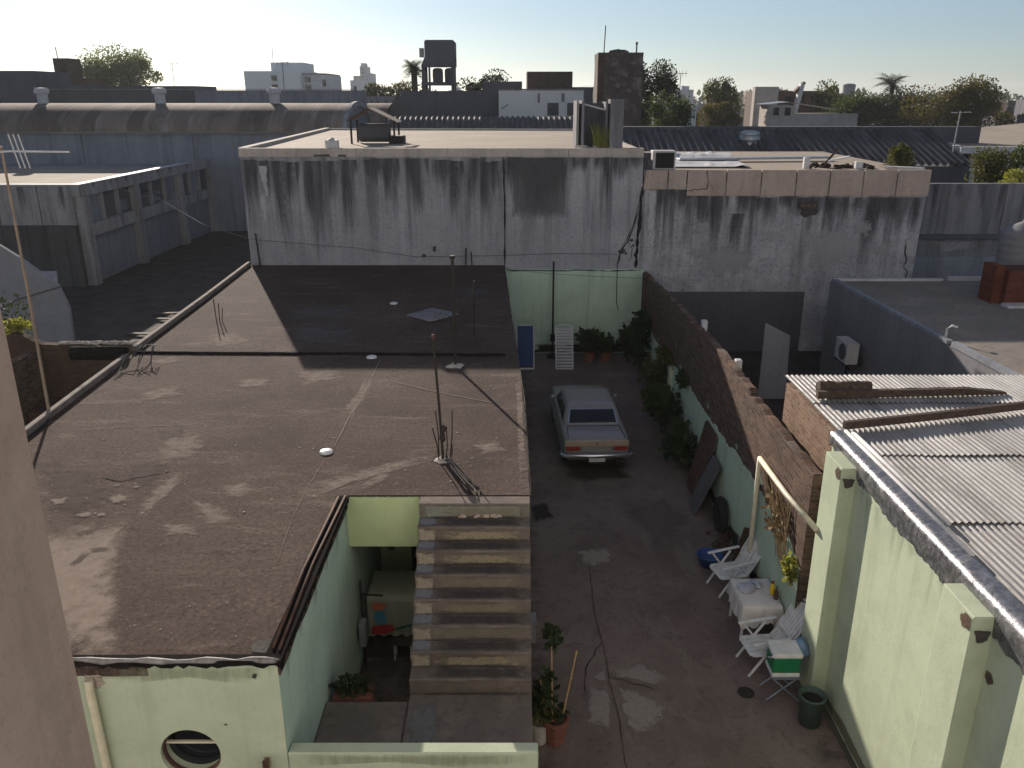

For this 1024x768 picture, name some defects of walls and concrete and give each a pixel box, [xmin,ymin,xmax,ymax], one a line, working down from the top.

leakage [244,157,640,221]
leakage [645,184,938,247]
spalling [799,201,818,218]
crack [903,239,915,278]
spalling [835,468,855,488]
spalling [960,612,991,643]
crack [584,566,657,768]